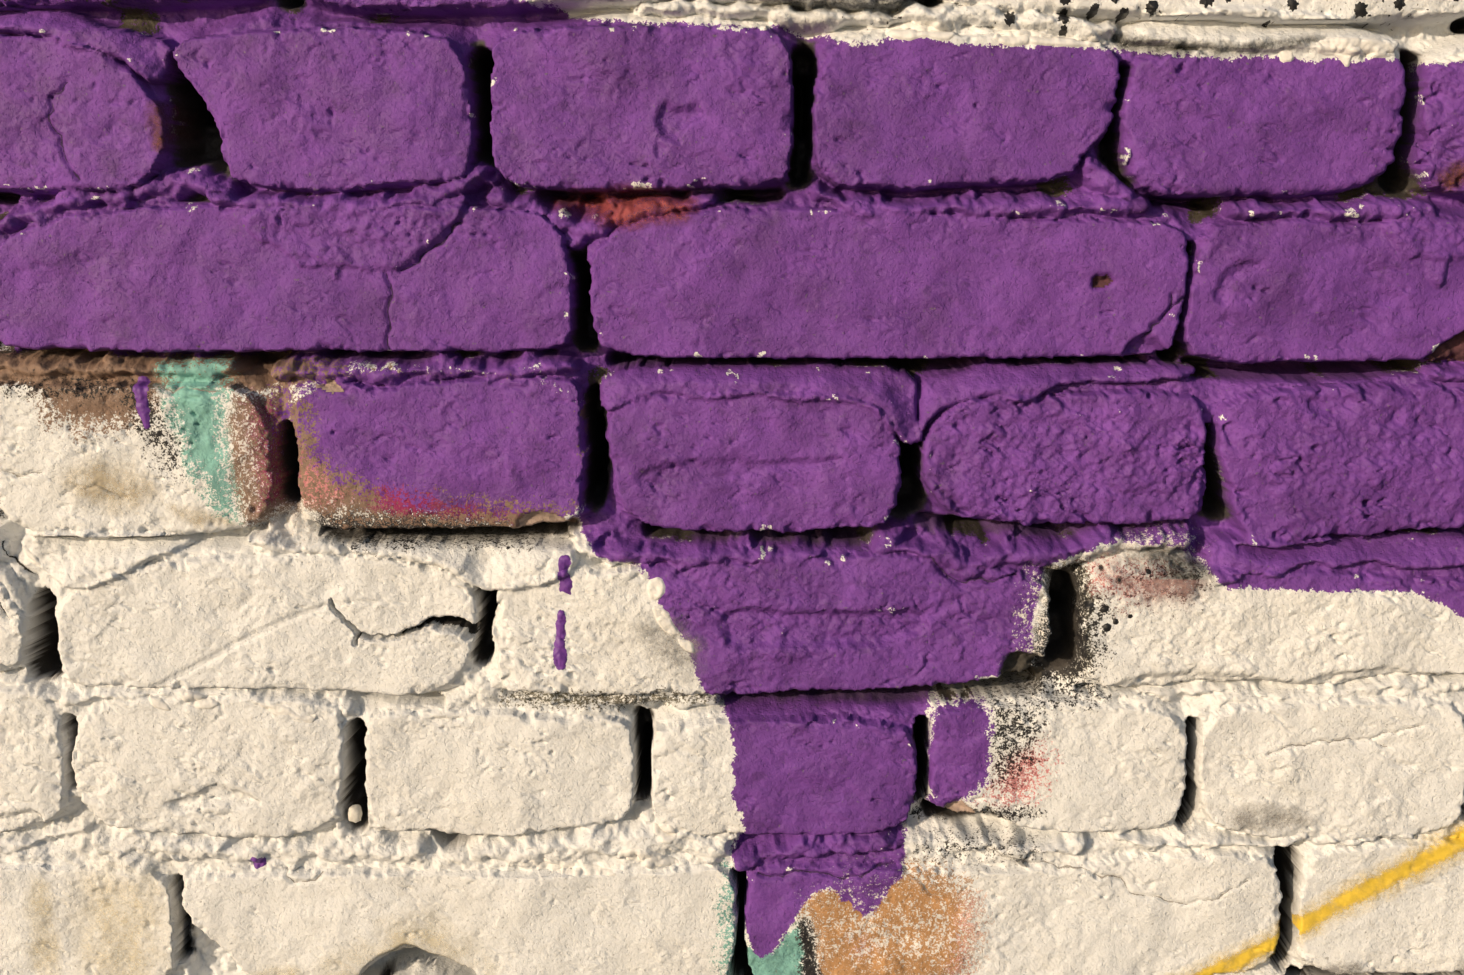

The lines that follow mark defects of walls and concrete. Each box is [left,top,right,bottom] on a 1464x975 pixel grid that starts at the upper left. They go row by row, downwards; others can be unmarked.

crack [402,613,492,634]